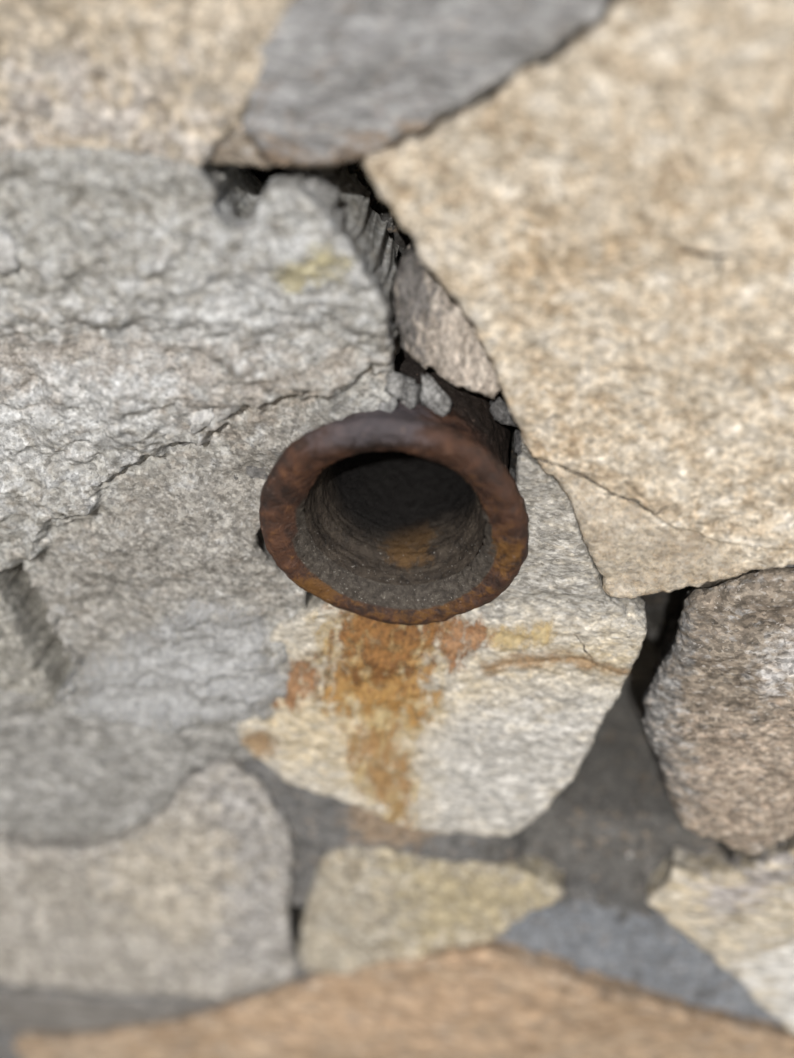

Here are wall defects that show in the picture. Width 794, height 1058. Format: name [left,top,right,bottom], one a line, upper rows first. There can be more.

crack [537,458,678,529]
rust [273,611,550,827]